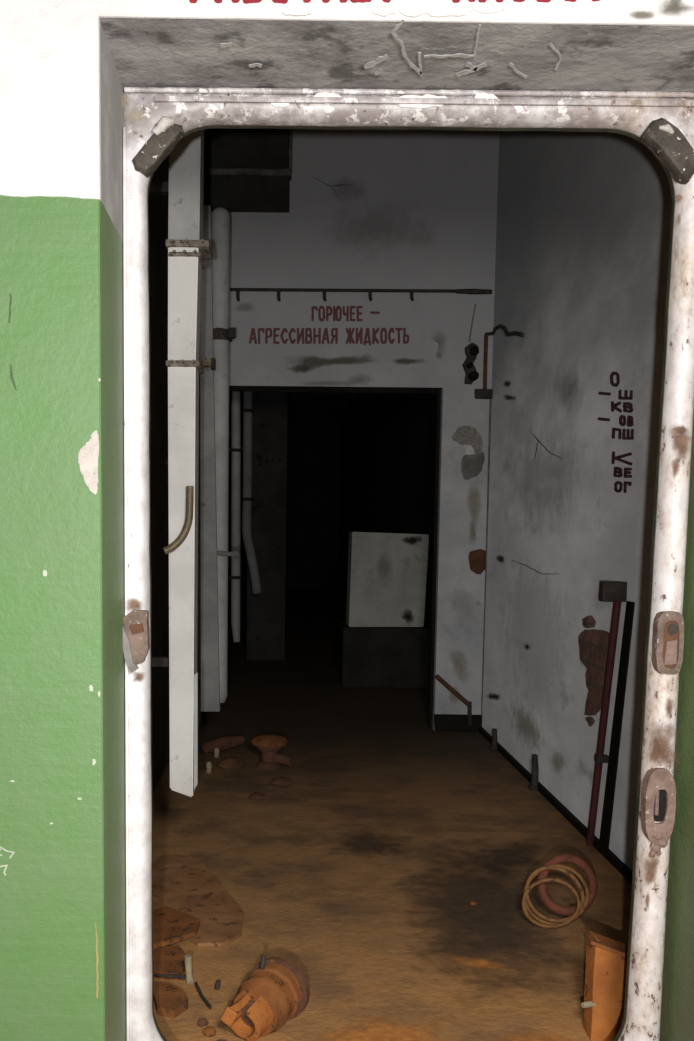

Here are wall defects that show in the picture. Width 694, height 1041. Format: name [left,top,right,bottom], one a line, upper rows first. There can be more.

peeling [78,430,99,495]
spalling [452,425,485,480]
corrosion [673,427,689,475]